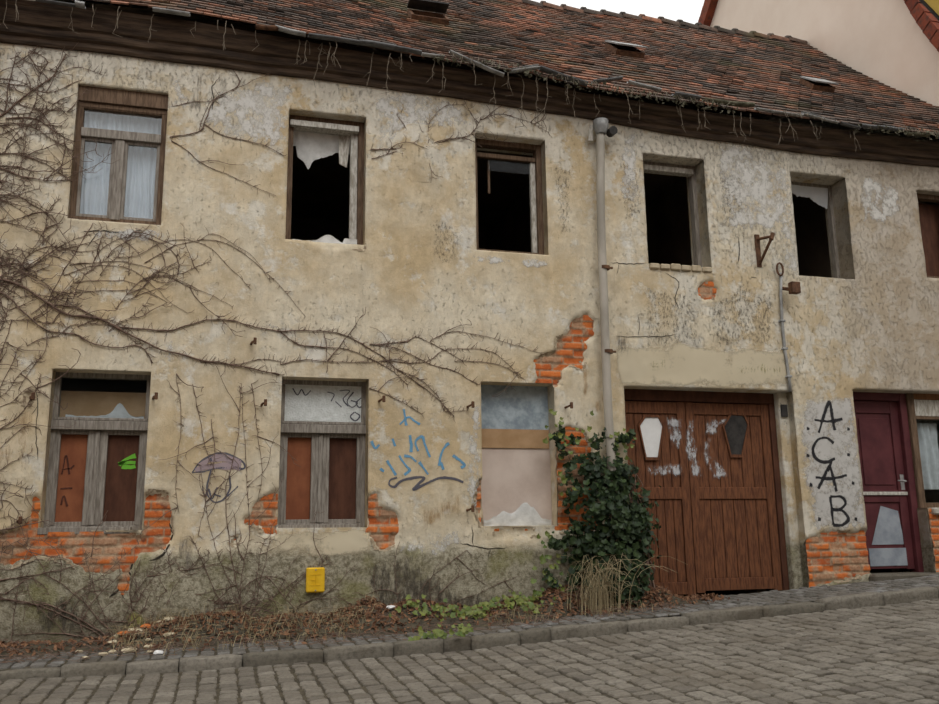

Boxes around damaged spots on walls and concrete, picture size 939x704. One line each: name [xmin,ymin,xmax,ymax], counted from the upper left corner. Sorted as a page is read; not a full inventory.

flaking render [698,281,717,300]
flaking render [533,315,594,387]
flaking render [0,489,174,595]
flaking render [227,492,278,549]
flaking render [365,494,399,552]
peeling [802,398,870,588]
flaking render [928,509,939,572]